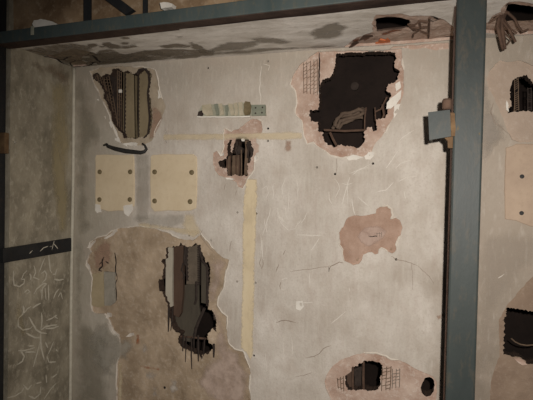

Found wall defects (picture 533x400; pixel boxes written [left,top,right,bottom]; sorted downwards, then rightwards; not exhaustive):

damp [26,37,287,65]
damp [313,23,344,38]
spalling [486,2,533,50]
spalling [51,50,166,146]
spalling [290,13,454,160]
spalling [487,61,533,142]
spalling [213,119,263,189]
flaking render [339,205,402,265]
spalling [85,225,251,400]
crack [393,257,446,304]
spalling [490,277,533,400]
spalling [325,352,437,400]